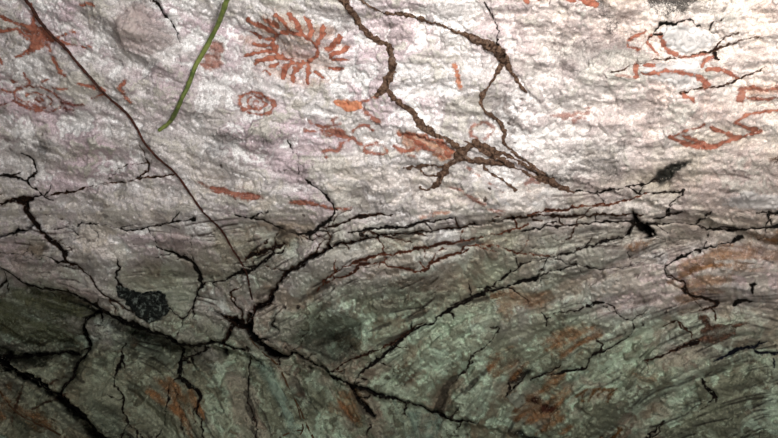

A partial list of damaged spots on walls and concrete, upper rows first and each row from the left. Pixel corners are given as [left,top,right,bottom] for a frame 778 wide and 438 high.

crack [150,0,182,67]
crack [484,1,500,46]
crack [611,18,759,73]
crack [679,68,762,94]
crack [0,140,778,438]